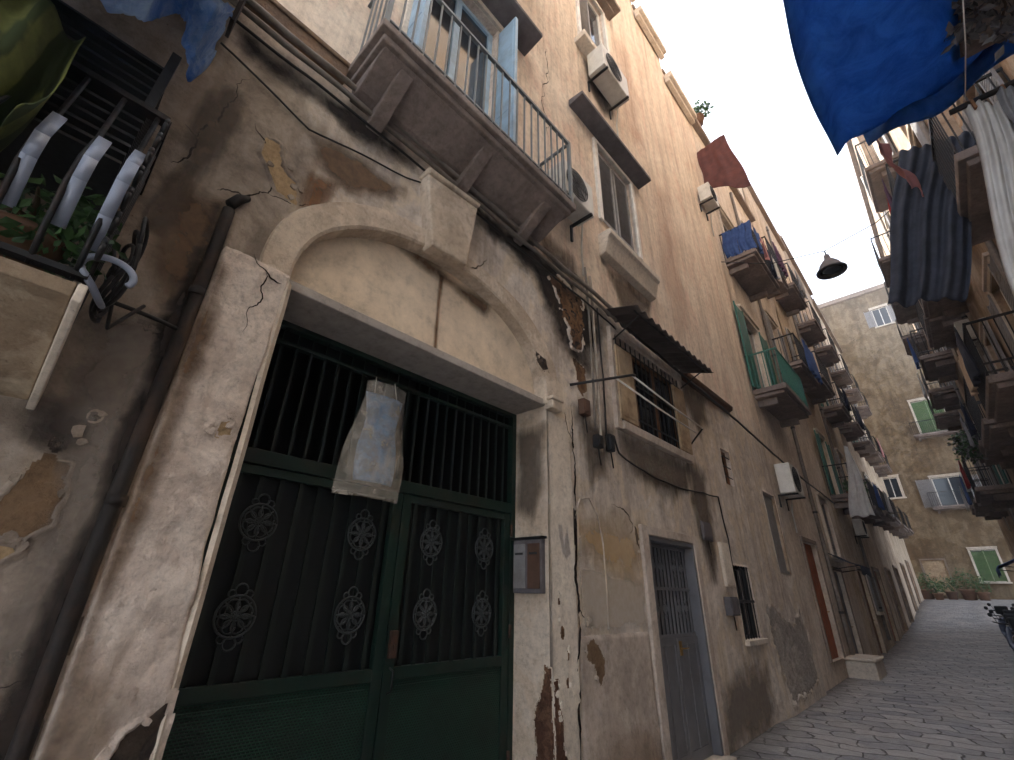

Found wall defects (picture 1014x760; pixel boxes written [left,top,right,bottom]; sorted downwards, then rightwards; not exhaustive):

leakage [147,89,240,299]
crack [243,256,281,331]
flaking render [547,274,588,398]
peeling [0,409,108,572]
crack [564,411,586,760]
peeling [558,617,572,662]
peeling [585,637,606,688]
flaking render [94,688,179,760]
flaking render [532,663,572,760]